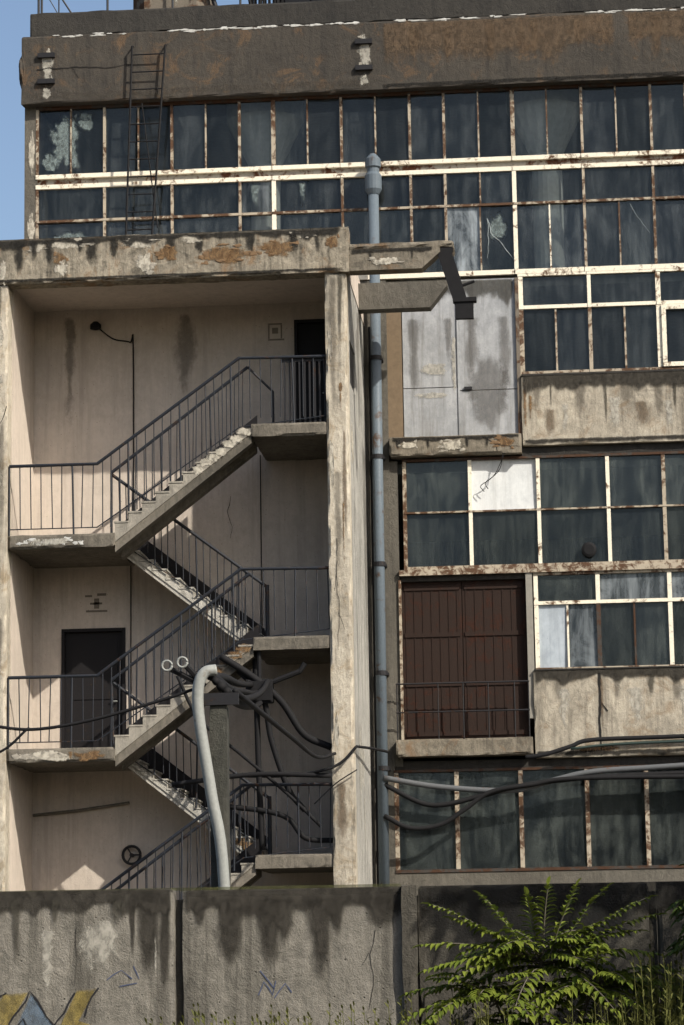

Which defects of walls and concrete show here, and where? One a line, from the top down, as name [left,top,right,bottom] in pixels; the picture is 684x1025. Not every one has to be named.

spalling [37,48,55,99]
spalling [27,213,96,276]
spalling [120,238,160,275]
spalling [181,236,203,244]
leakage [461,279,512,304]
leakage [523,371,684,424]
leakage [393,404,684,448]
leakage [536,667,684,724]
leakage [0,888,171,986]
leakage [186,886,401,970]